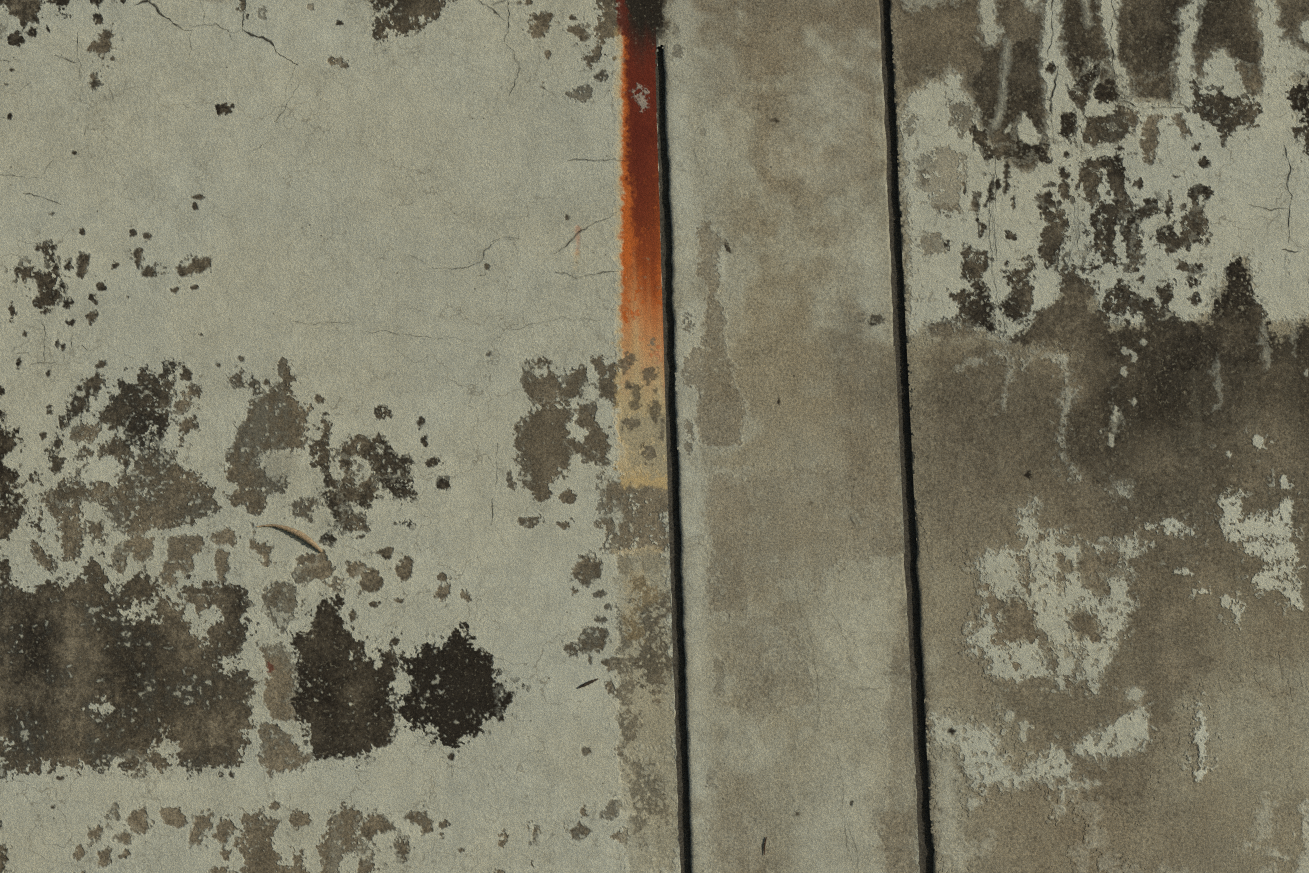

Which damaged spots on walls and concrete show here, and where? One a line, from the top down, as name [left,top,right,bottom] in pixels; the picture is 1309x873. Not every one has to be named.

peeling [332,17,348,30]
damp [662,0,692,64]
peeling [0,110,16,126]
peeling [208,98,242,121]
peeling [187,190,208,213]
peeling [896,0,1309,339]
corrosion [608,0,668,493]
damp [819,0,1309,873]
peeling [0,207,532,873]
peeling [500,349,670,699]
peeling [574,744,598,761]
peeling [487,790,623,873]